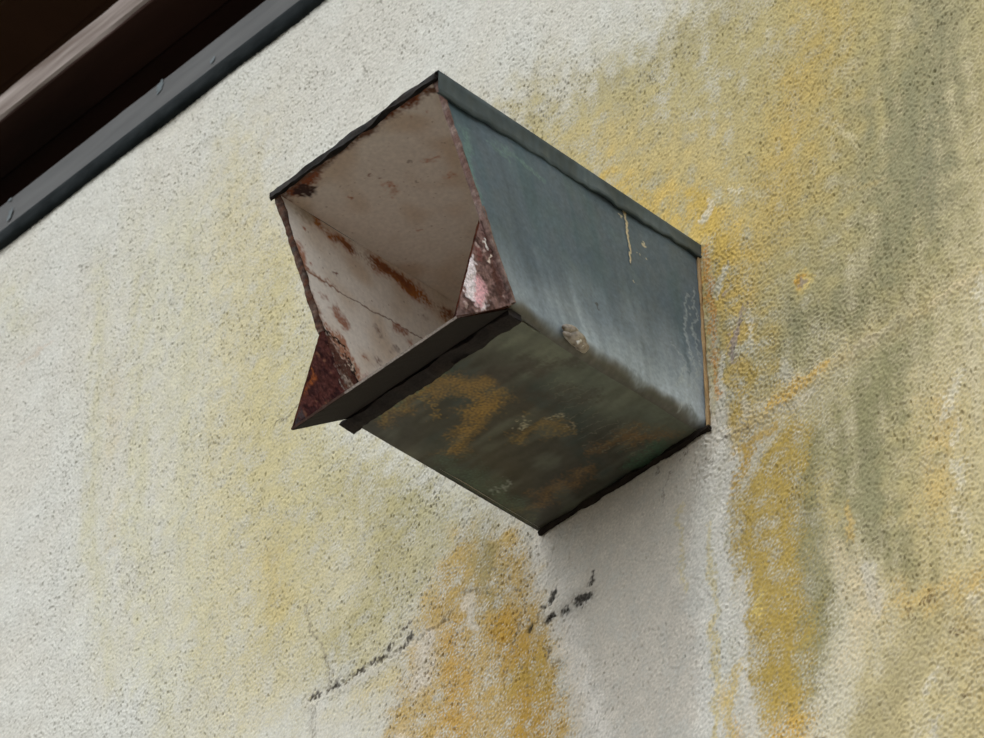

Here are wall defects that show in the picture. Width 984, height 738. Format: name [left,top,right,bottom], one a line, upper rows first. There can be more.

water stain [437,0,984,738]
rust [700,241,724,398]